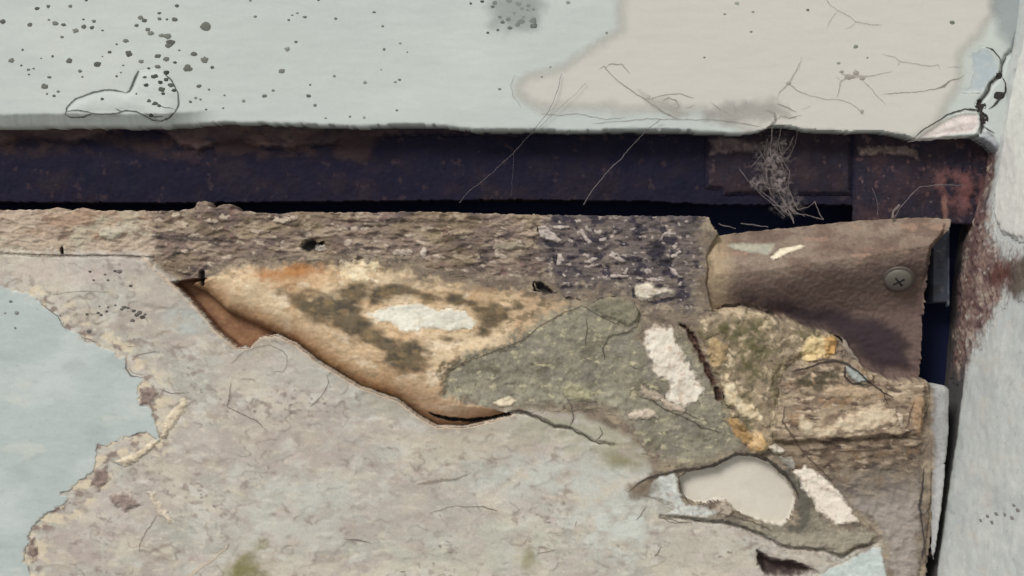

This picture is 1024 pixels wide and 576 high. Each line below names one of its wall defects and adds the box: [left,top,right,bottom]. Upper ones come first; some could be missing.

water stain [34,5,104,38]
water stain [94,4,214,77]
water stain [469,0,537,34]
crack [827,1,879,29]
crack [547,54,964,129]
crack [917,47,1012,135]
rust [936,169,985,219]
water stain [290,283,510,371]
peeling [0,201,951,576]
crack [510,402,610,445]